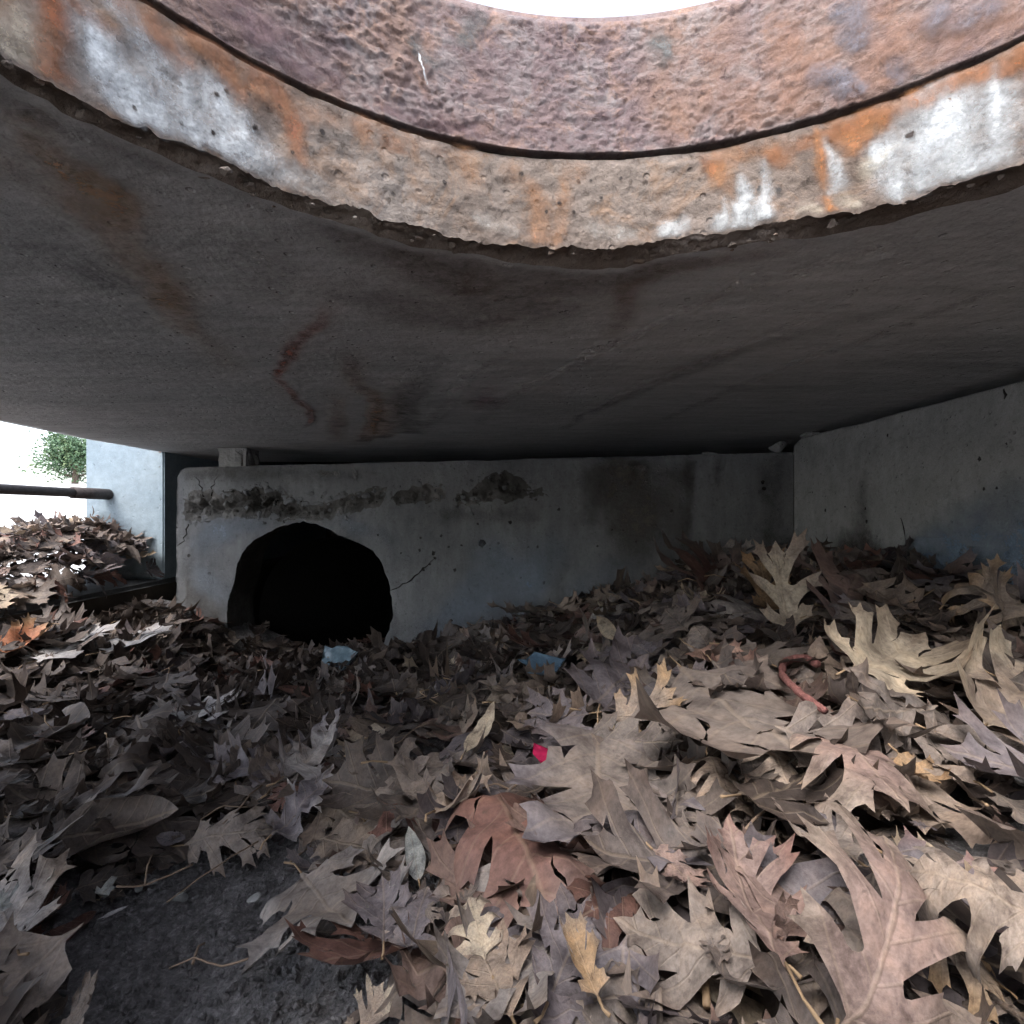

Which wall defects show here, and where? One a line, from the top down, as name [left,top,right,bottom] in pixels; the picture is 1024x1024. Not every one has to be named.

efflorescence [825,151,842,181]
rust [799,110,887,178]
efflorescence [869,74,1013,199]
efflorescence [659,222,682,235]
efflorescence [716,180,772,229]
spalling [181,462,549,527]
crack [390,557,436,591]